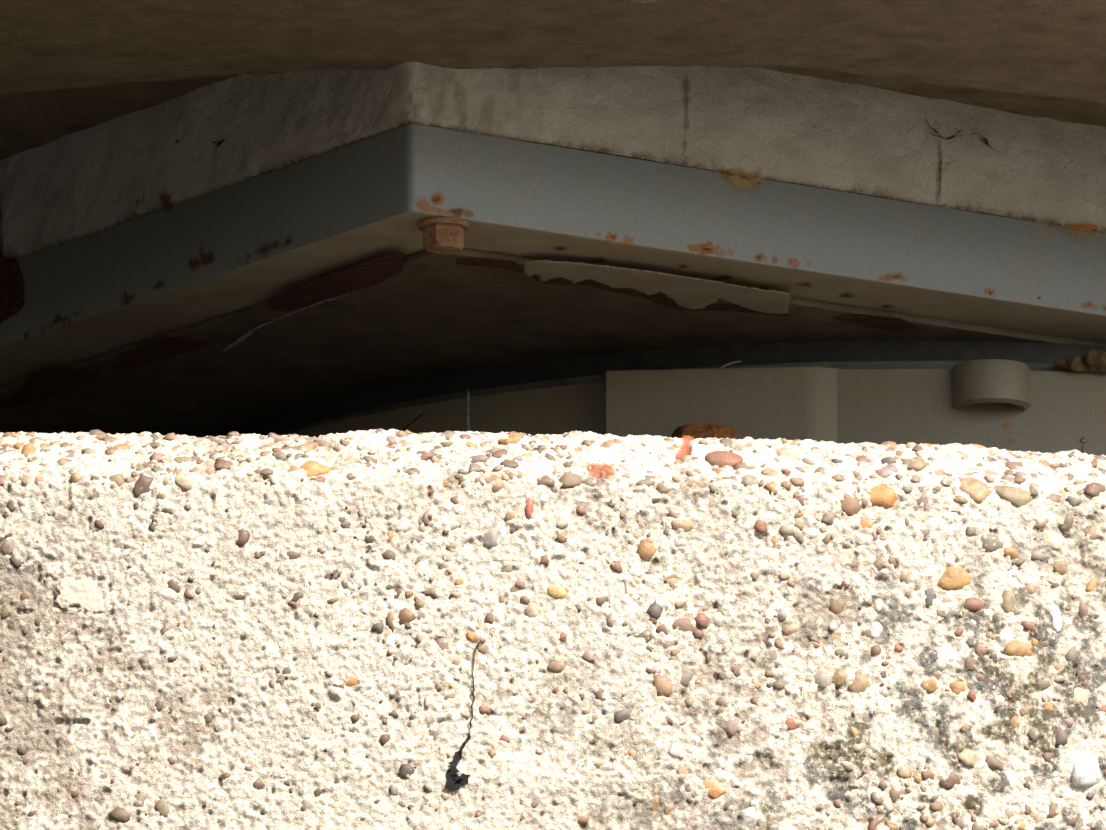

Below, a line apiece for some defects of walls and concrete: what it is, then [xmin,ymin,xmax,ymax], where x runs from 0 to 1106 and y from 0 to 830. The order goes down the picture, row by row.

corrosion [418,195,472,216]
corrosion [690,243,732,254]
corrosion [0,256,25,324]